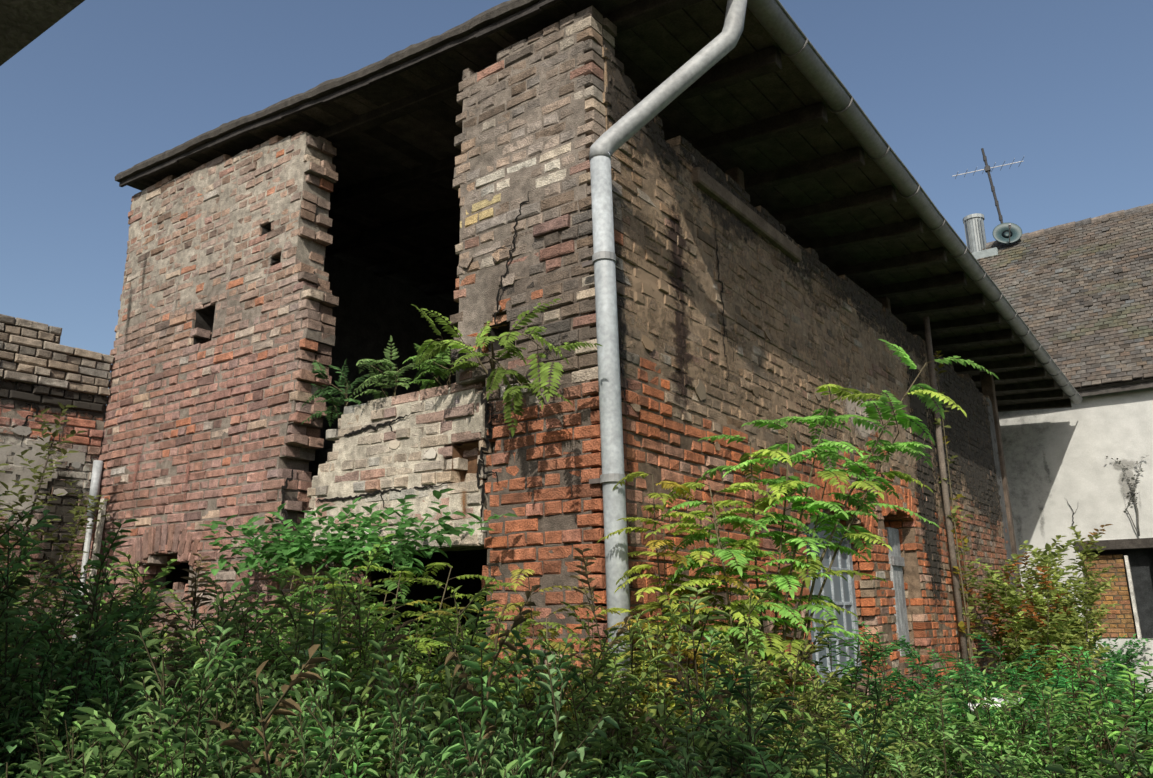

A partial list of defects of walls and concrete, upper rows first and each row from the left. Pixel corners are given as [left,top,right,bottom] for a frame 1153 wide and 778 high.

crack [489,189,534,325]
crack [267,469,293,543]
crack [316,353,515,531]
water stain [908,353,1021,605]